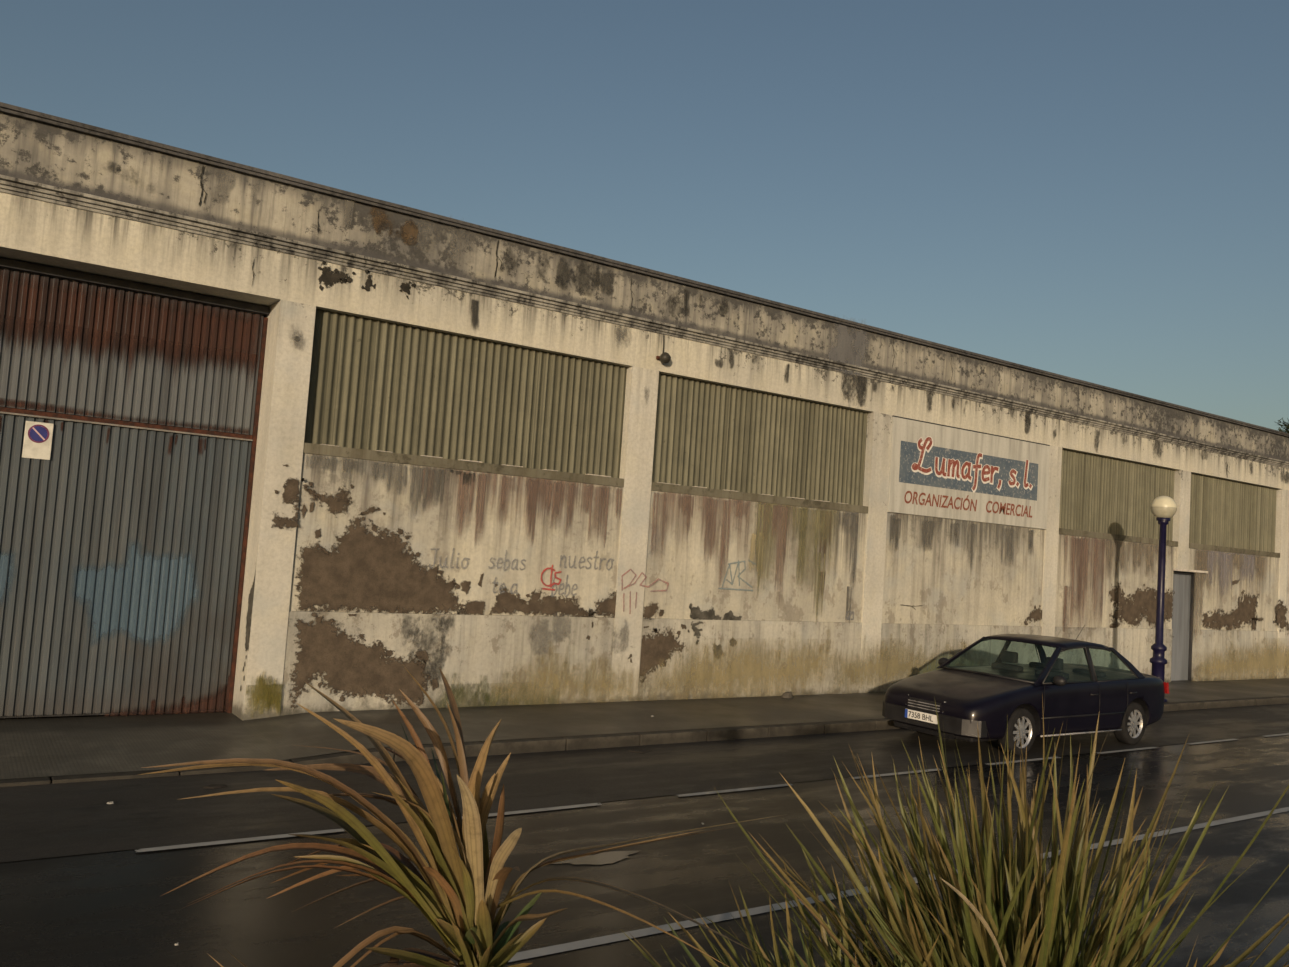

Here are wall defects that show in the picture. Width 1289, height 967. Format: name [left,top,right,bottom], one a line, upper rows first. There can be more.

rust [0,268,262,370]
flaking render [271,464,617,712]
flaking render [628,603,742,683]
leakage [797,508,858,615]
leakage [890,514,1033,566]
flaking render [1108,583,1175,629]
flaking render [1202,579,1289,632]